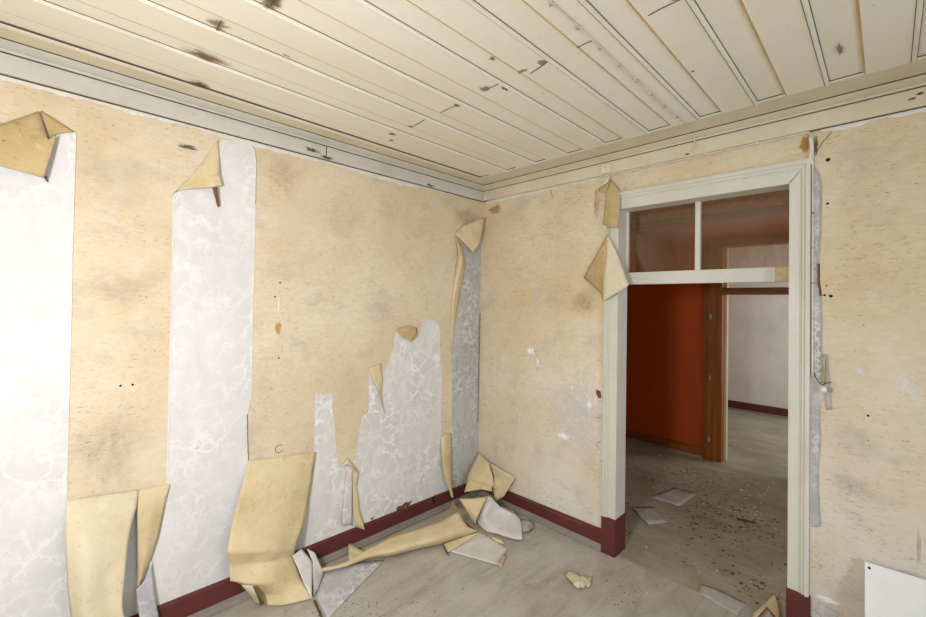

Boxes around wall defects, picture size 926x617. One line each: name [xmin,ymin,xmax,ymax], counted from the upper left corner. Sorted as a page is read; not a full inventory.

peeling [0,117,76,617]
peeling [122,140,257,617]
peeling [295,236,481,551]